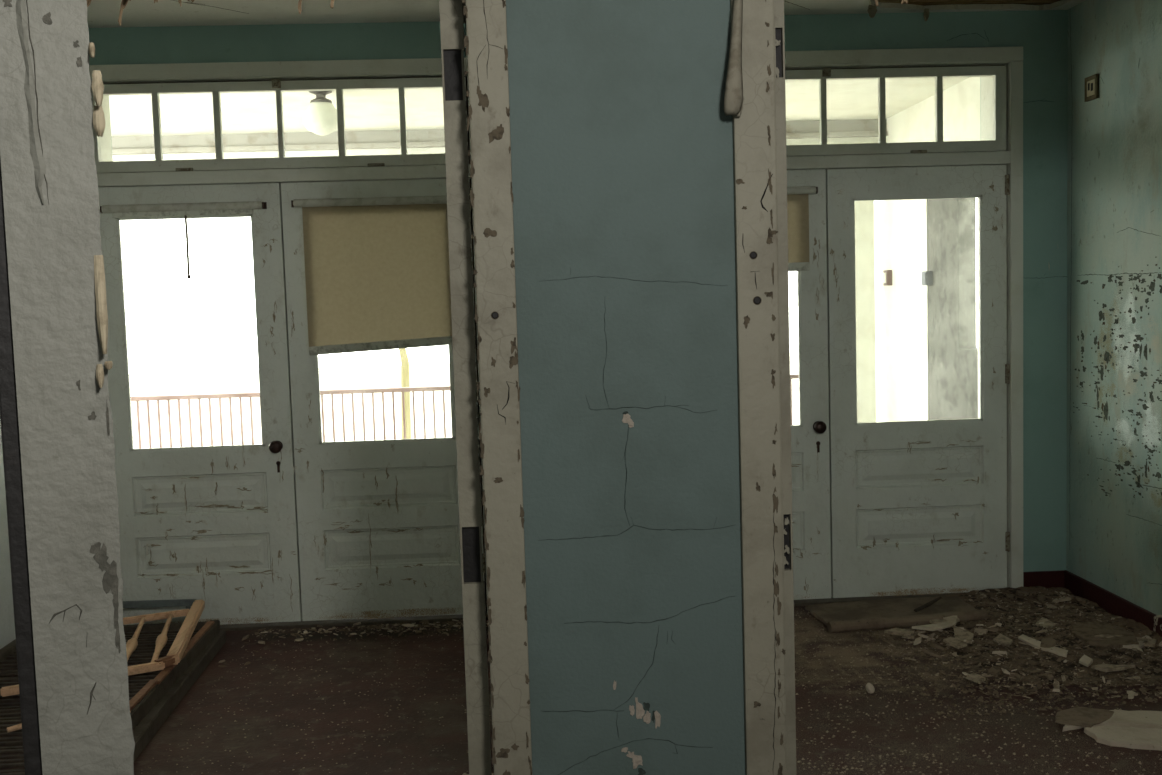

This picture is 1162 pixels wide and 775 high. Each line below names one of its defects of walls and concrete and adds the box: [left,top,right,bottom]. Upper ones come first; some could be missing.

spalling [867,0,1072,21]
peeling [477,86,489,112]
peeling [488,107,511,153]
peeling [491,337,520,401]
peeling [1073,257,1162,500]
spalling [756,463,778,534]
peeling [90,542,121,653]
spalling [629,697,661,728]
spalling [621,747,646,775]